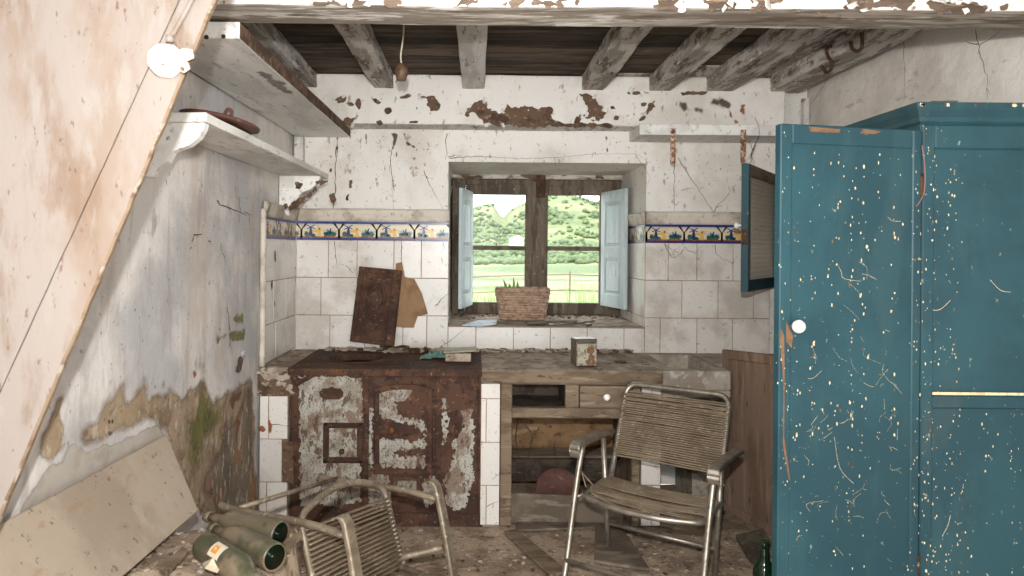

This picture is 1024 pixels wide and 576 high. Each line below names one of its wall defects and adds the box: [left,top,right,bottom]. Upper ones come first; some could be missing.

peeling [313,0,402,8]
peeling [502,0,585,9]
peeling [652,0,688,13]
peeling [703,0,737,12]
peeling [751,0,783,12]
peeling [817,0,1009,17]
peeling [333,93,441,128]
peeling [465,93,619,129]
peeling [627,87,655,121]
crack [673,158,733,211]
damp [82,379,257,514]